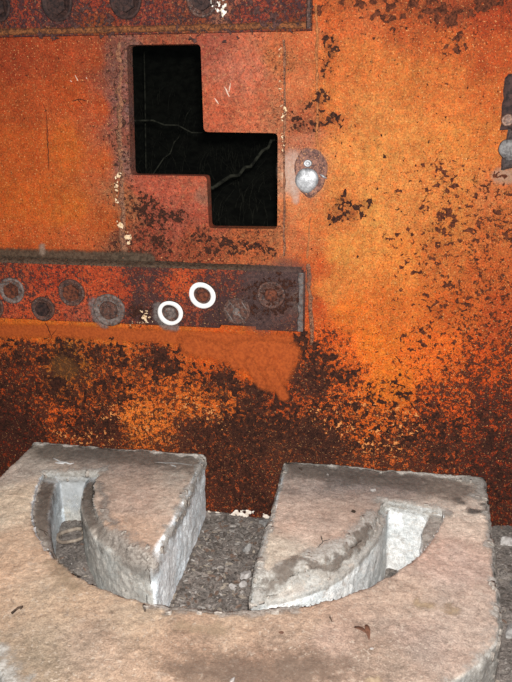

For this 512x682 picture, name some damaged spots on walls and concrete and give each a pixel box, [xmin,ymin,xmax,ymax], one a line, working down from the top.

corrosion [181,336,300,401]